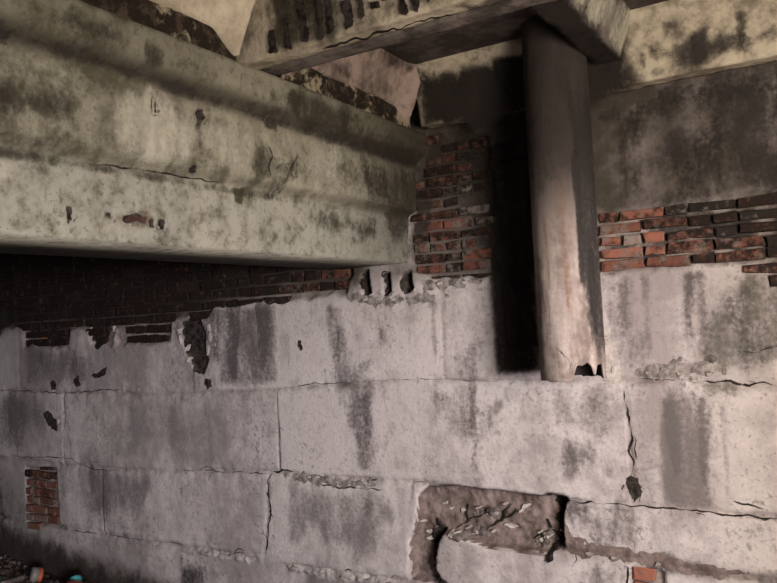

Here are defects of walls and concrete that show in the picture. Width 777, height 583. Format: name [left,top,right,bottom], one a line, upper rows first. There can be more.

leakage [117,87,201,180]
leakage [287,91,350,177]
leakage [234,164,298,204]
spalling [346,271,482,308]
peeling [86,317,116,350]
peeling [177,319,213,389]
crack [639,378,772,387]
crack [624,392,637,476]
leakage [648,394,708,502]
crack [187,457,293,555]
spalling [409,485,568,583]
crack [564,494,777,521]